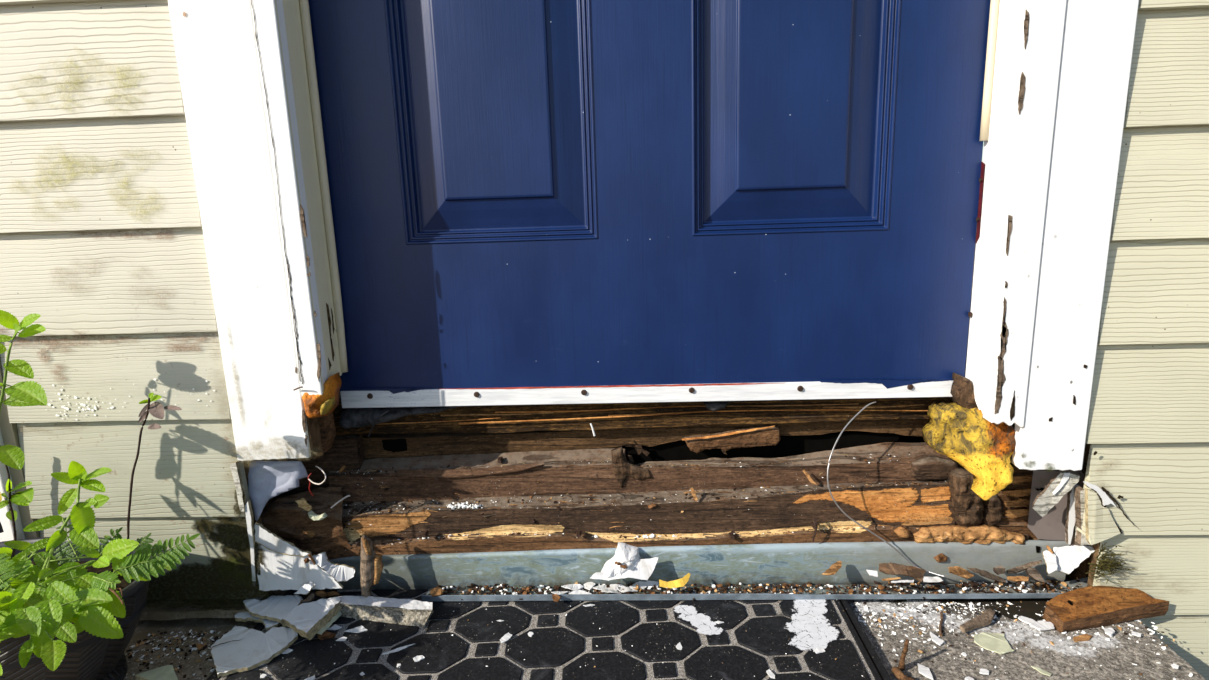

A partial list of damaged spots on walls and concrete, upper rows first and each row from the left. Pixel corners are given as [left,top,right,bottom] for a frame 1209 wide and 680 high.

peeling [994,281,1015,429]
spalling [1043,443,1097,475]
peeling [295,498,312,511]
peeling [343,512,431,544]
peeling [794,486,1044,545]
spalling [1066,554,1091,580]
peeling [294,583,314,595]